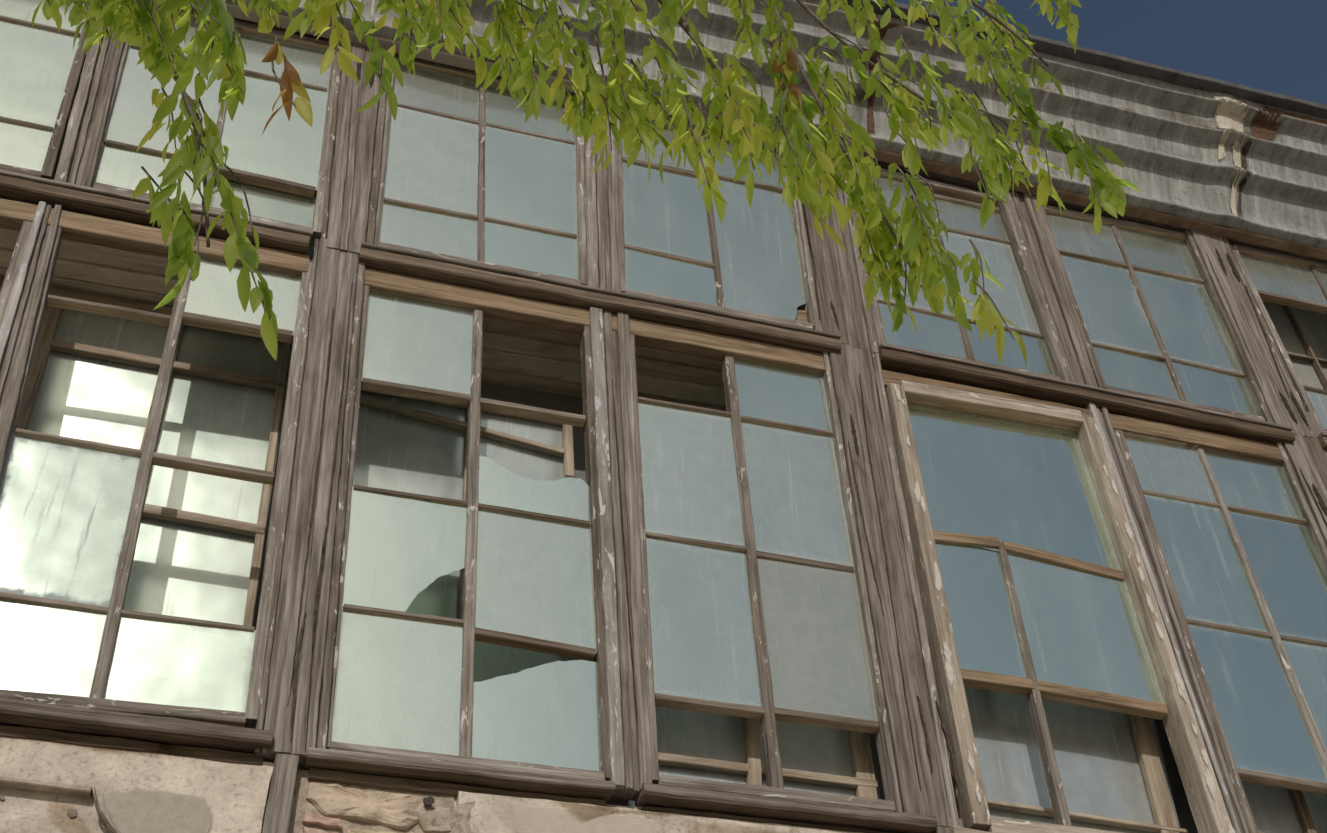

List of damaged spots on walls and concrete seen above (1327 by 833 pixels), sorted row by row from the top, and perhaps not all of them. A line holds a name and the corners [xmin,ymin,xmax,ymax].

rust [867,19,903,133]
leakage [1215,97,1249,216]
rust [1251,106,1327,140]
flaking render [288,770,475,833]